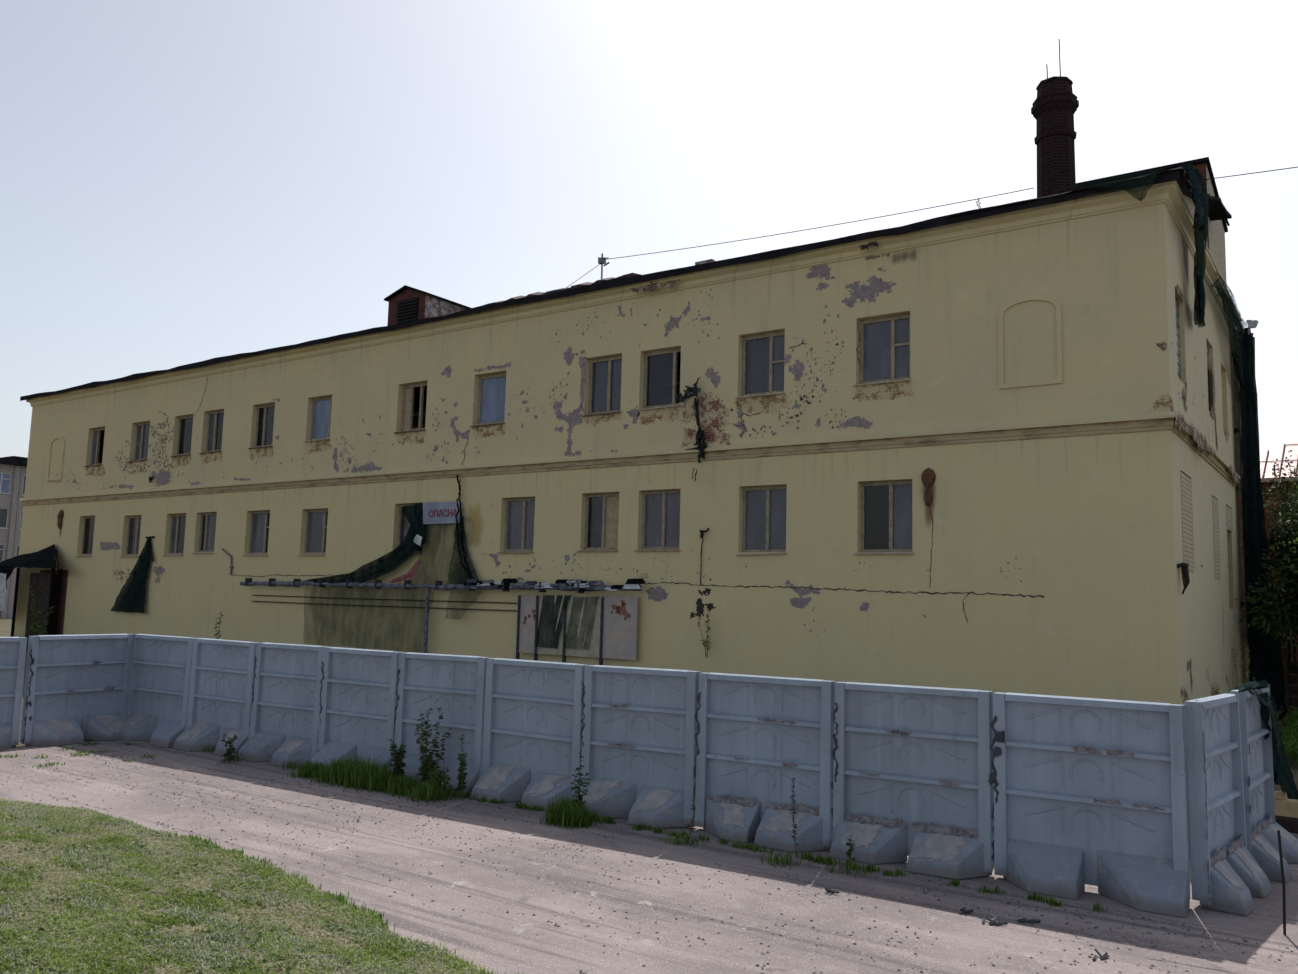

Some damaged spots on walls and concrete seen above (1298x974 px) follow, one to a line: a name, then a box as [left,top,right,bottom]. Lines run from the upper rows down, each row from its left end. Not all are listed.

peeling [805,241,897,309]
peeling [664,302,710,337]
flaking render [362,347,804,457]
flaking render [837,377,914,429]
flaking render [1151,359,1229,456]
flaking render [72,412,281,489]
peeling [785,580,820,609]
crack [647,508,1044,623]
peeling [1181,660,1193,702]